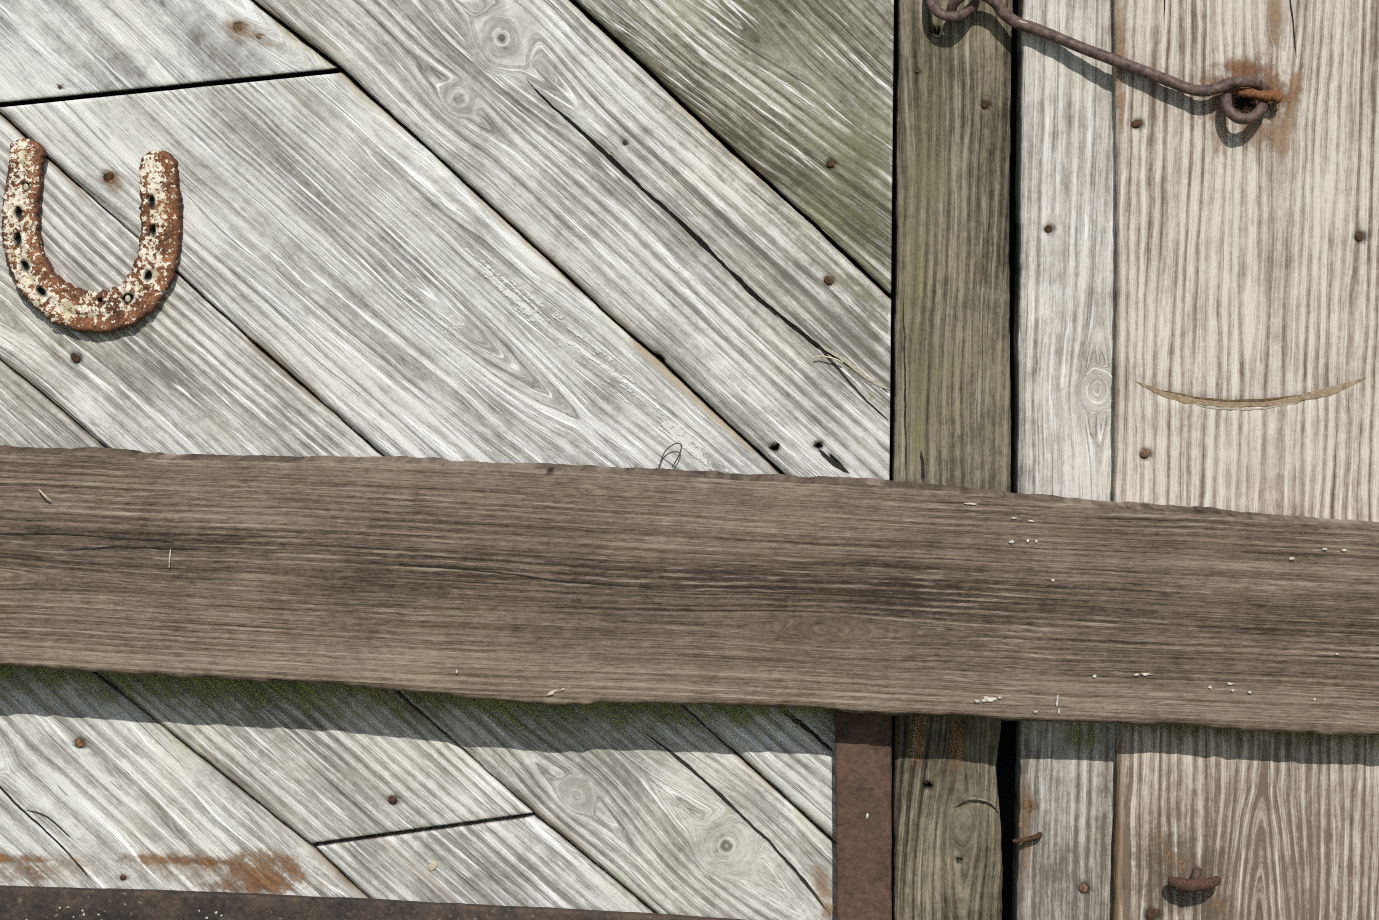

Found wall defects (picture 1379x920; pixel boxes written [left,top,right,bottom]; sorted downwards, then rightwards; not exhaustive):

corrosion [1212,59,1301,152]
corrosion [0,854,53,879]
corrosion [141,850,303,895]